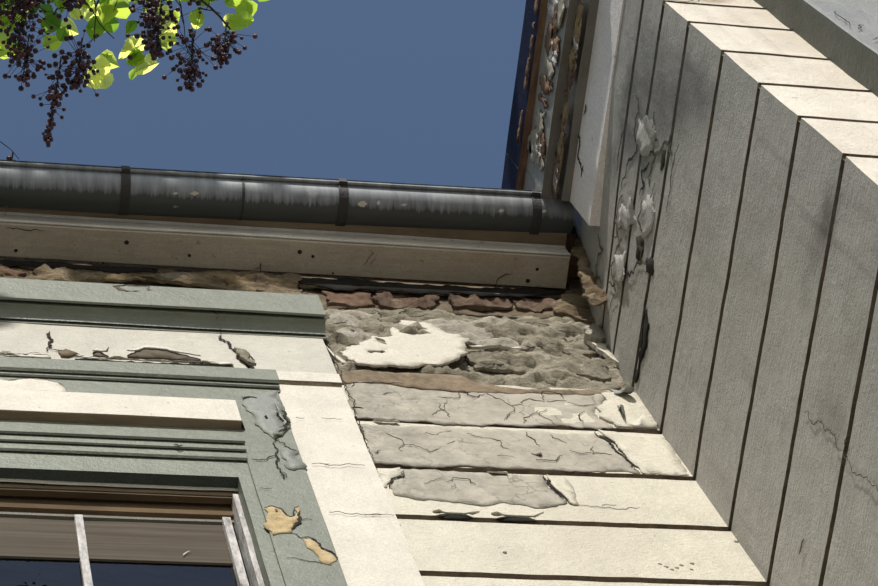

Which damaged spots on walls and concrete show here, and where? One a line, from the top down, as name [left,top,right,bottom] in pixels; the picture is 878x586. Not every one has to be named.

peeling [516,0,585,200]
flaking render [0,95,689,508]
crack [637,294,646,360]
crack [254,342,378,489]
crack [804,411,878,491]
peeling [263,505,338,566]
crack [301,511,401,526]